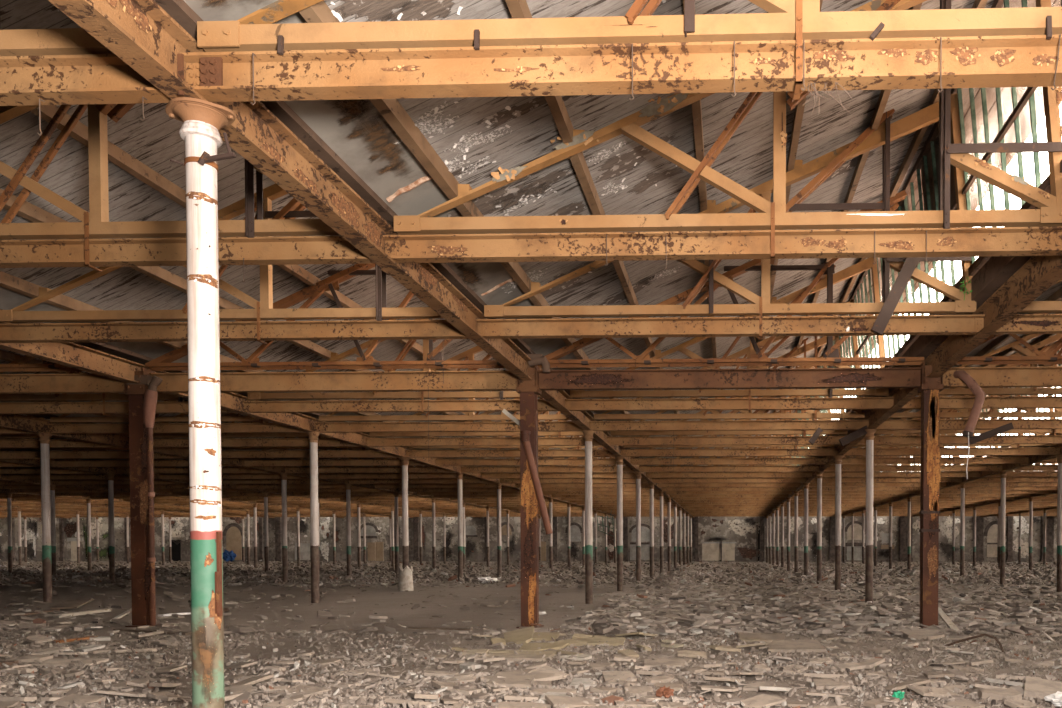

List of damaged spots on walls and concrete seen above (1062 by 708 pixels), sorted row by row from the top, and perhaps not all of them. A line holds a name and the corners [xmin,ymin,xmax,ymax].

peeling [330,0,463,22]
water stain [328,99,407,174]
peeling [415,101,460,138]
peeling [444,96,575,216]
corrosion [140,432,149,524]
corrosion [925,390,941,579]
corrosion [520,460,539,626]
corrosion [208,591,222,630]